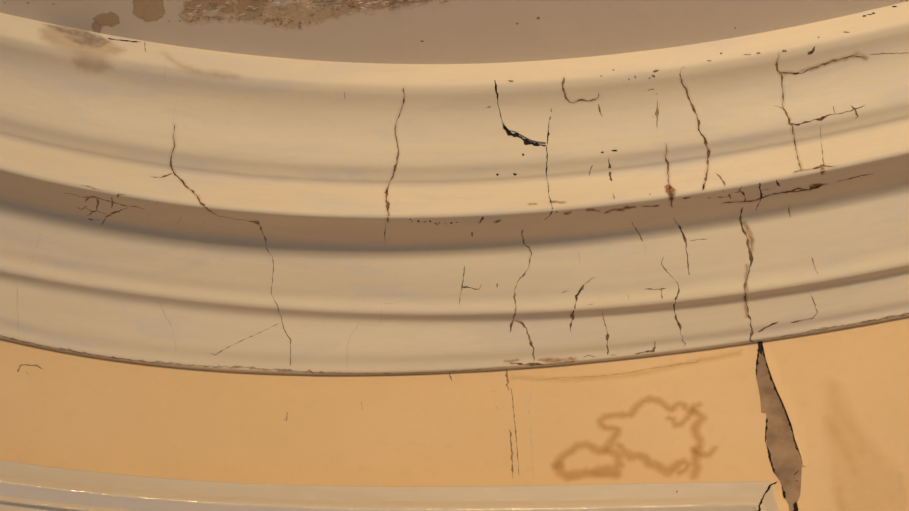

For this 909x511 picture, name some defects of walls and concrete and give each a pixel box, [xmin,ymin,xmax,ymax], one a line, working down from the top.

peeling [169,0,426,28]
crack [384,88,405,237]
crack [0,126,404,374]
crack [422,46,909,477]
crack [757,481,798,511]